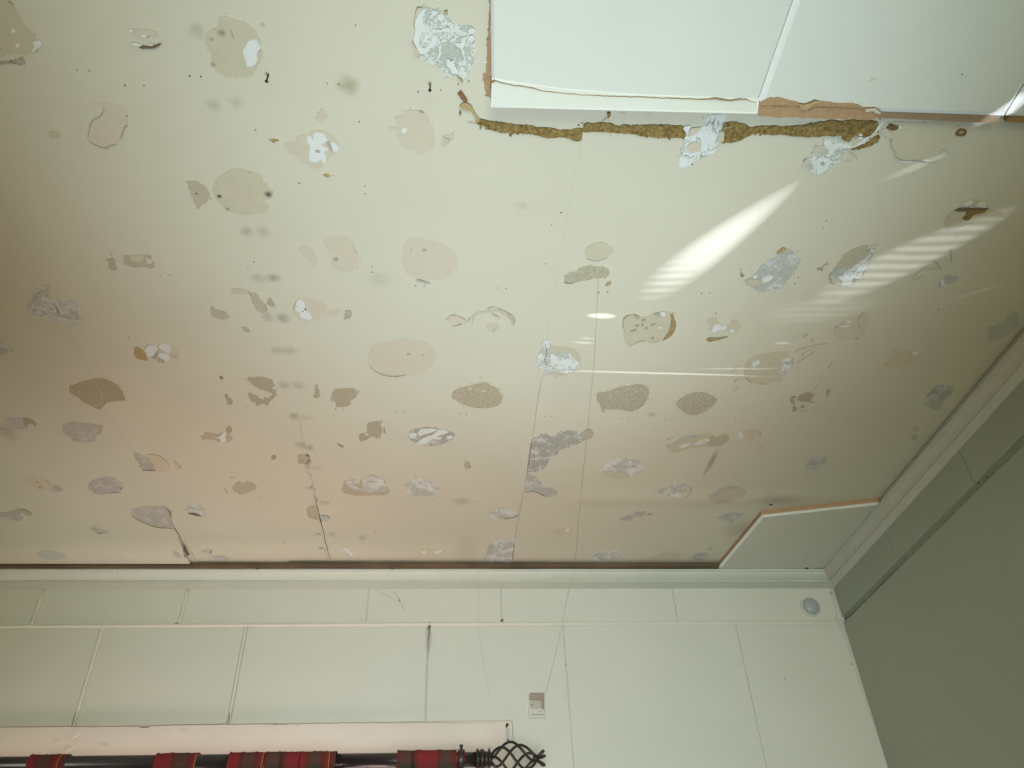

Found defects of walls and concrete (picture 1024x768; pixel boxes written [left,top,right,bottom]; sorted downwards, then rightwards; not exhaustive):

peeling [205,13,263,79]
peeling [413,8,475,74]
peeling [269,108,343,178]
peeling [816,133,863,174]
peeling [817,244,877,288]
peeling [622,311,676,346]
peeling [451,382,504,409]
peeling [596,383,649,413]